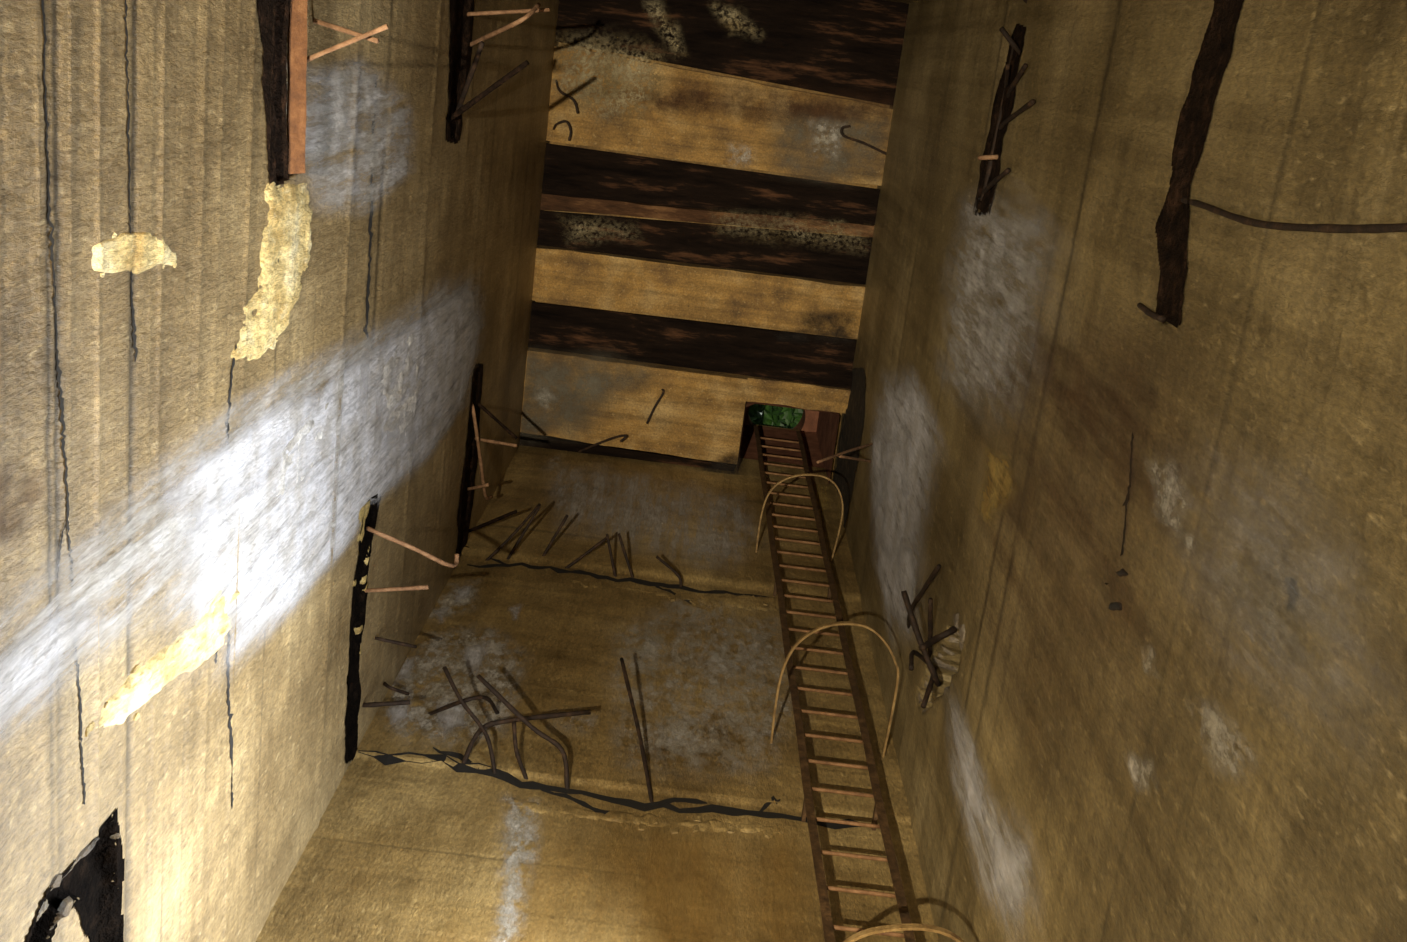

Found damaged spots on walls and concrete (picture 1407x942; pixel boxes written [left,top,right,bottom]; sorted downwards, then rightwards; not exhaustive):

leakage [559,43,657,112]
spalling [91,232,177,278]
spalling [231,182,312,361]
leakage [953,212,1039,395]
peeling [85,590,240,737]
crack [467,558,767,604]
spalling [901,564,965,713]
crack [358,747,861,829]
leakage [503,803,532,942]